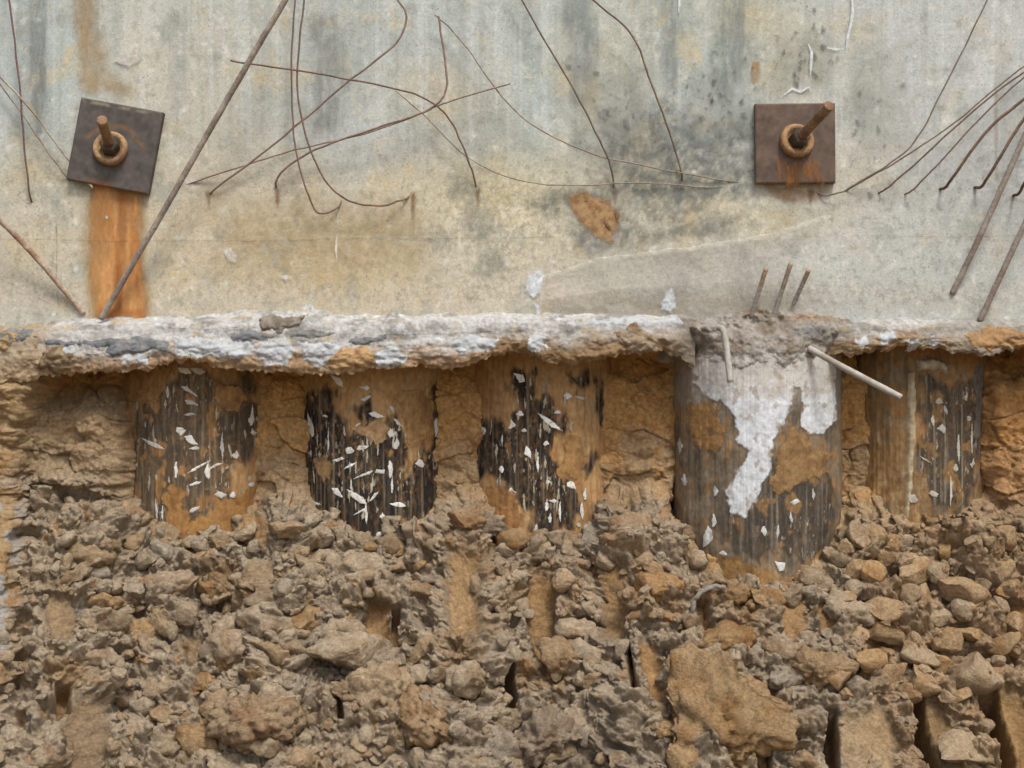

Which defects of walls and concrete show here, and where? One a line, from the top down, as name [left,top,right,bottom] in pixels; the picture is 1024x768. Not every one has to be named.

spalling [569,191,620,242]
rust [87,185,148,319]
spalling [259,313,309,334]
spalling [613,322,659,354]
spalling [964,324,1024,353]
spalling [37,345,74,377]
spalling [328,345,375,387]
leakage [688,352,837,518]